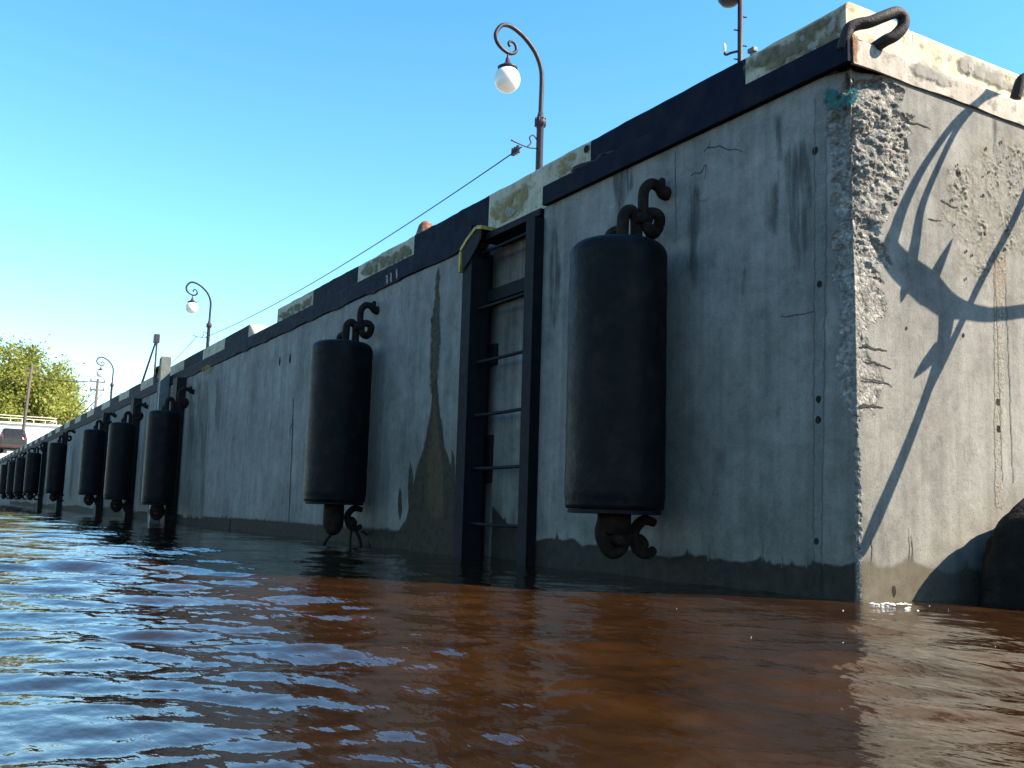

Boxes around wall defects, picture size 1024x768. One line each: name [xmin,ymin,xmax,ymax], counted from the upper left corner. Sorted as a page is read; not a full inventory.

crack [675,139,742,243]
water stain [176,268,455,555]
spalling [823,75,913,597]
water stain [535,528,981,603]